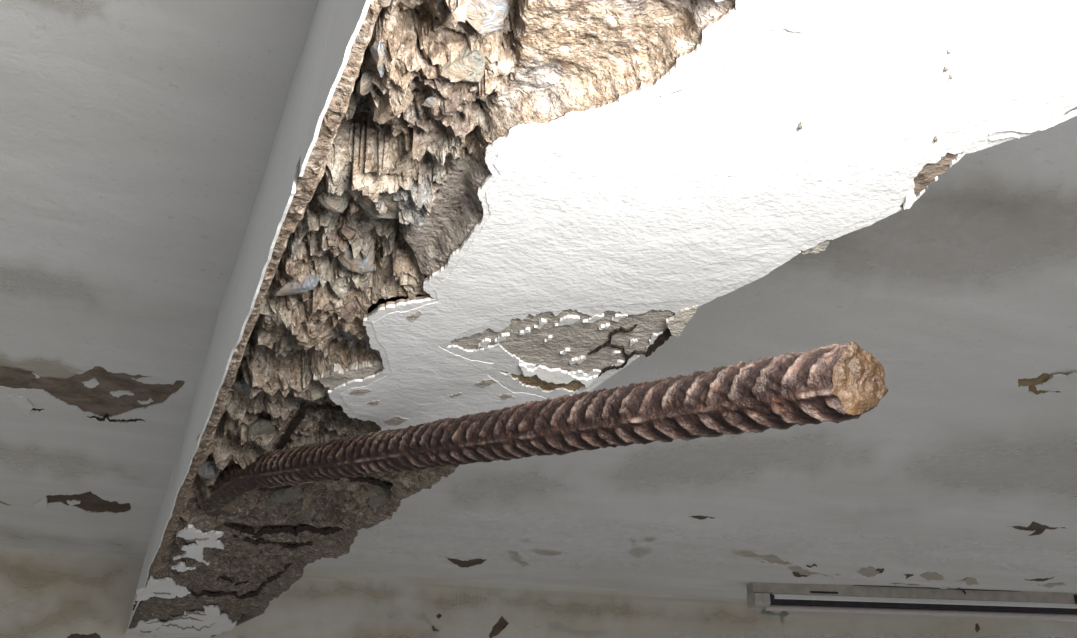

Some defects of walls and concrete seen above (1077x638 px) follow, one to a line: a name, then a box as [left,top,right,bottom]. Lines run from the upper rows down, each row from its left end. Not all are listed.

peeling [989,109,1077,141]
spalling [900,152,960,209]
spalling [125,0,888,638]
crack [588,324,672,377]
peeling [0,366,185,417]
peeling [1018,372,1077,395]
peeling [33,491,131,513]
crack [188,523,343,600]
water stain [385,520,766,559]
peeling [1012,521,1065,536]